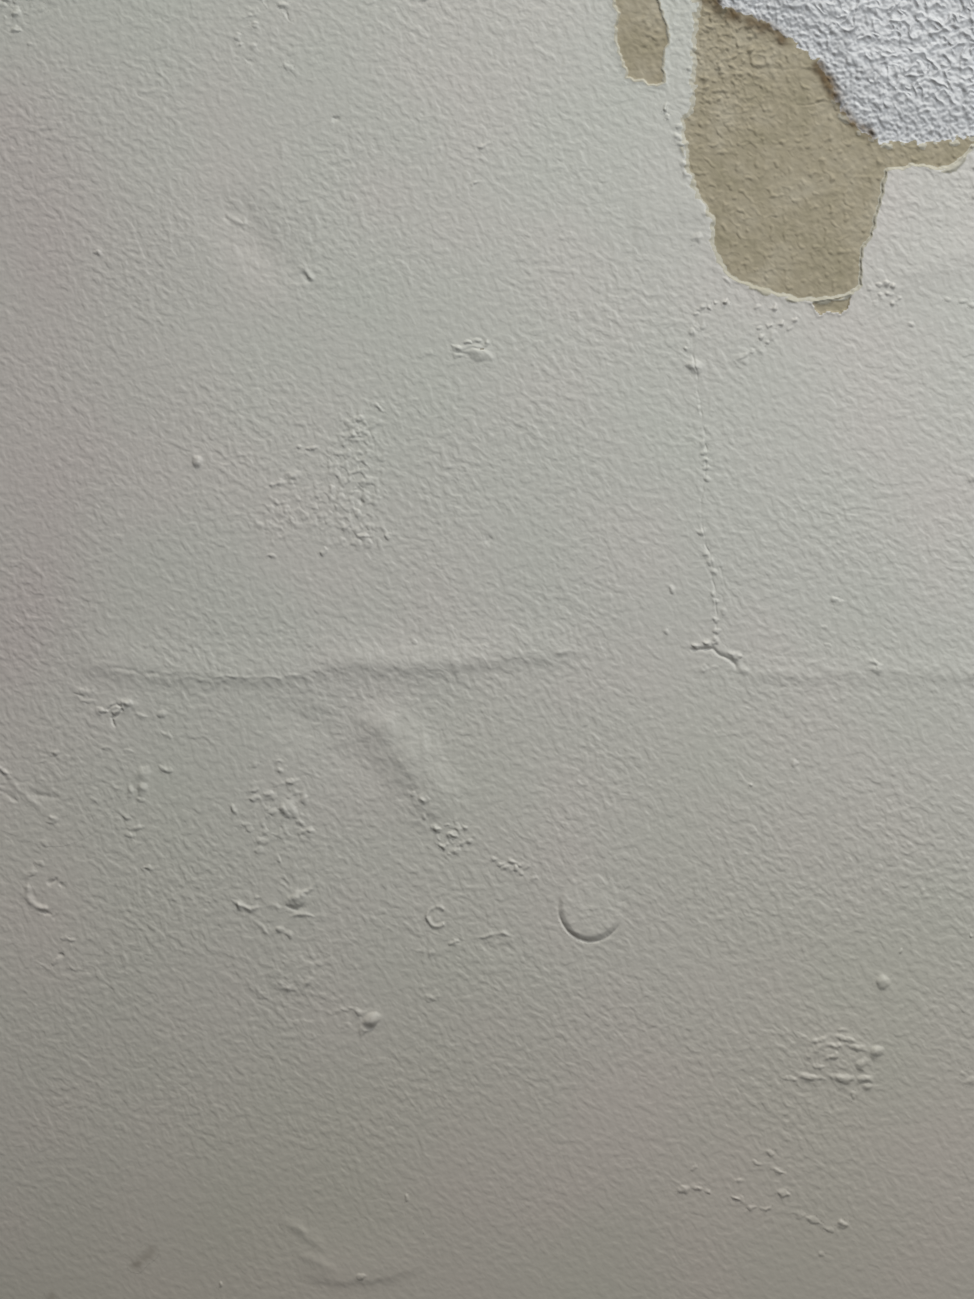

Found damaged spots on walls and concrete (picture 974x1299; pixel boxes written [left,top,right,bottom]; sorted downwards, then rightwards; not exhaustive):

peeling [607,0,974,366]
crack [681,316,730,641]